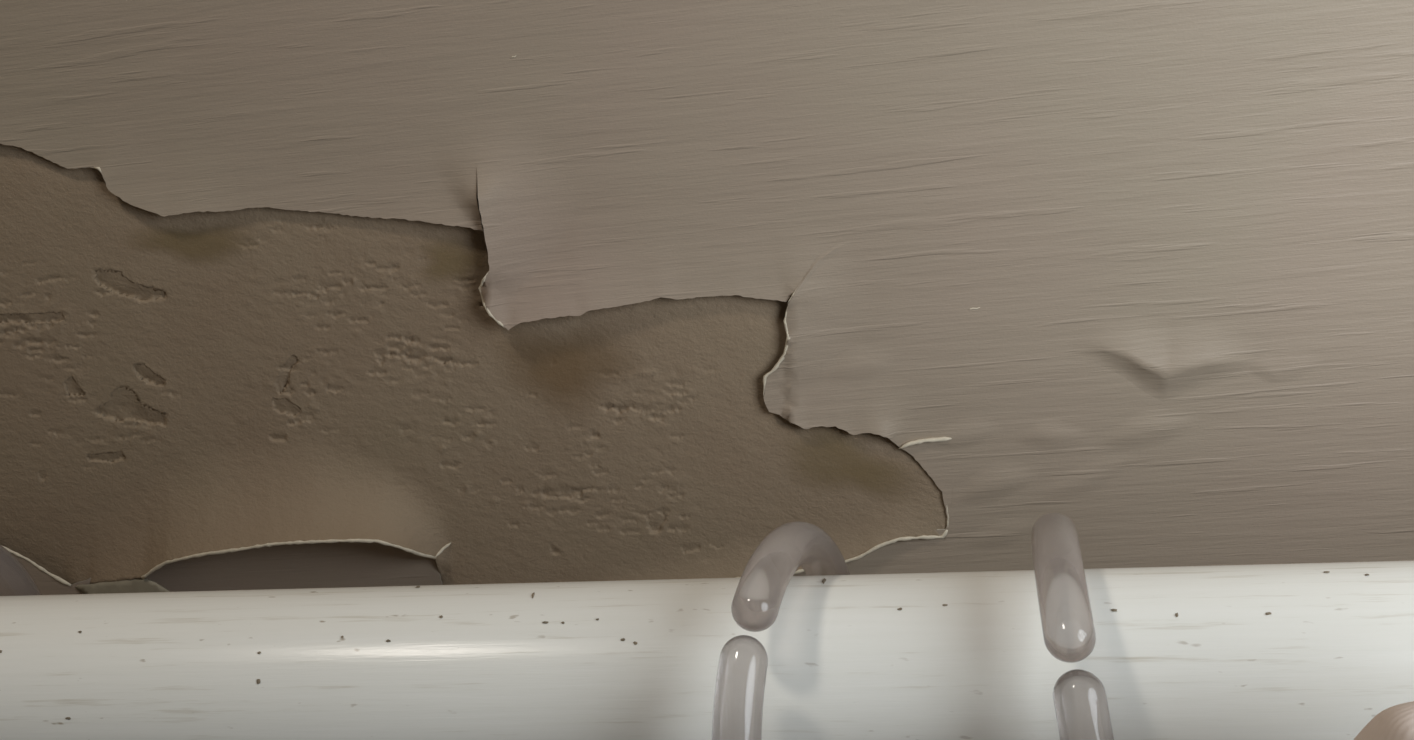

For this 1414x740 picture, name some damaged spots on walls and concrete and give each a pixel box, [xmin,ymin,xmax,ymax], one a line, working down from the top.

peeling [0,30,1052,595]